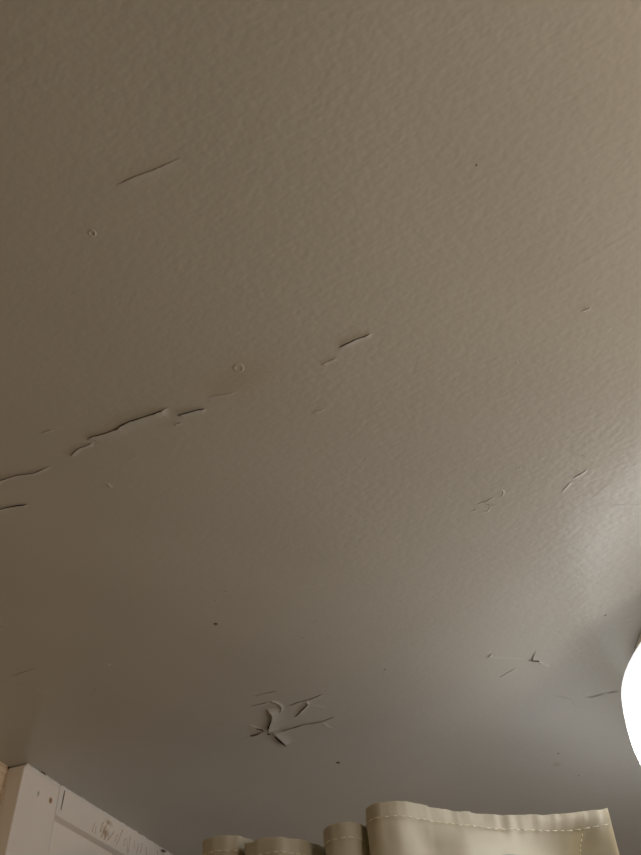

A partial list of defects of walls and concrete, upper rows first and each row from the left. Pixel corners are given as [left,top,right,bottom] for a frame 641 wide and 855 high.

peeling [244,691,338,747]